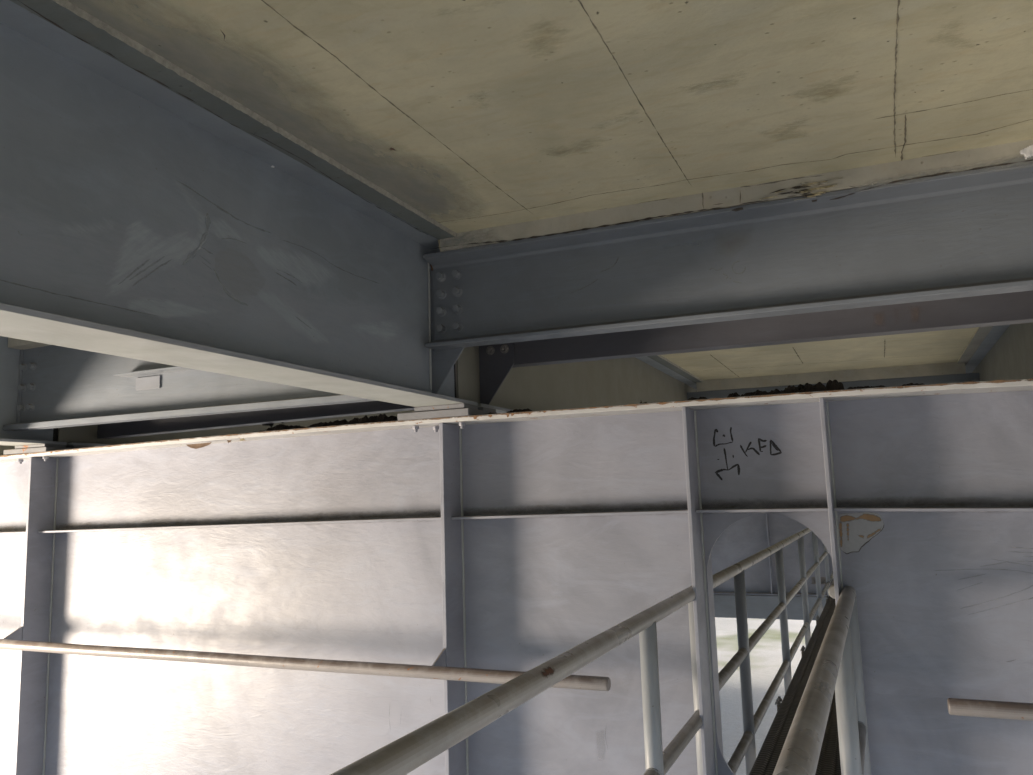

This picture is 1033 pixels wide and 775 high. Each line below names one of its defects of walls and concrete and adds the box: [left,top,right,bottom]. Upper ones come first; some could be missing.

crack [18,0,816,249]
crack [856,151,1033,192]